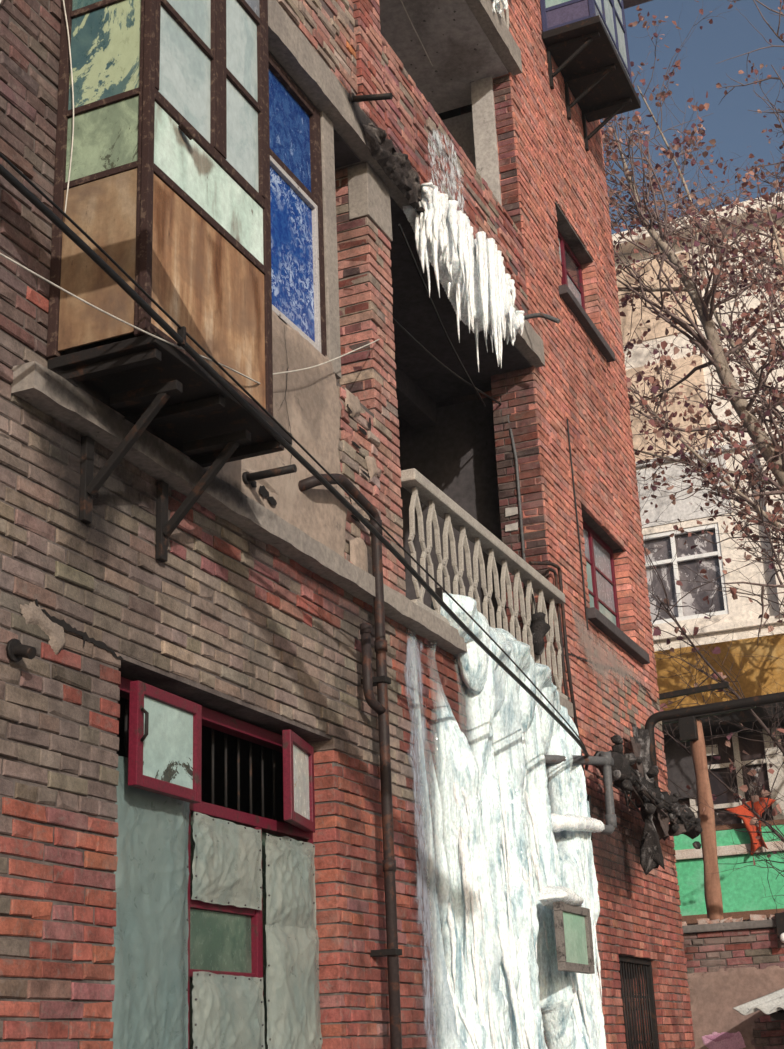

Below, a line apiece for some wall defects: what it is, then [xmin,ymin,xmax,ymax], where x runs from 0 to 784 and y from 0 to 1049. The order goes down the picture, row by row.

spalling [340,76,425,215]
flaking render [340,387,384,575]
crack [35,599,123,660]